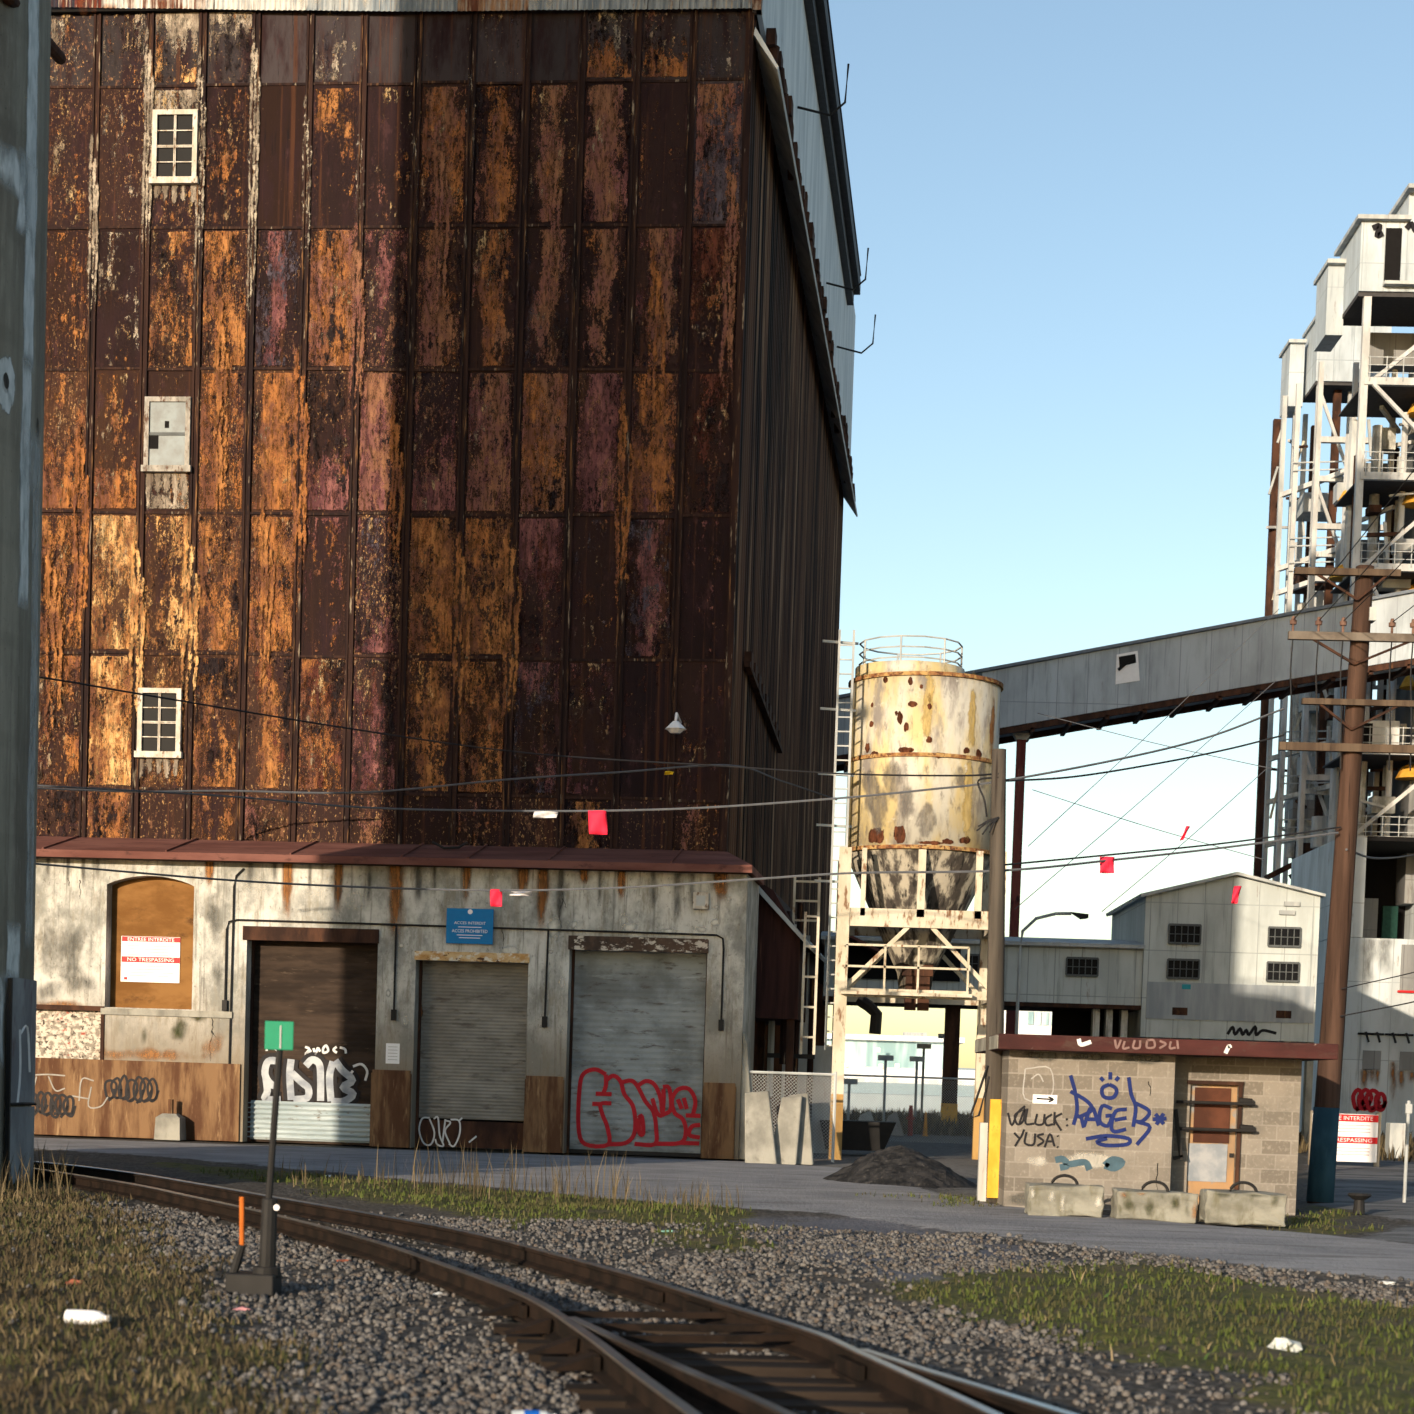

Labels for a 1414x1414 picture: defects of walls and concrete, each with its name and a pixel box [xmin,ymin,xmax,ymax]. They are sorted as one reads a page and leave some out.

corrosion [43,422,91,734]
corrosion [127,521,147,730]
corrosion [180,516,201,719]
corrosion [212,297,232,532]
corrosion [257,346,310,689]
corrosion [348,221,366,412]
corrosion [501,520,522,738]
corrosion [614,239,667,624]
corrosion [717,142,741,447]
corrosion [895,670,947,759]
corrosion [868,691,995,845]
corrosion [283,864,292,910]